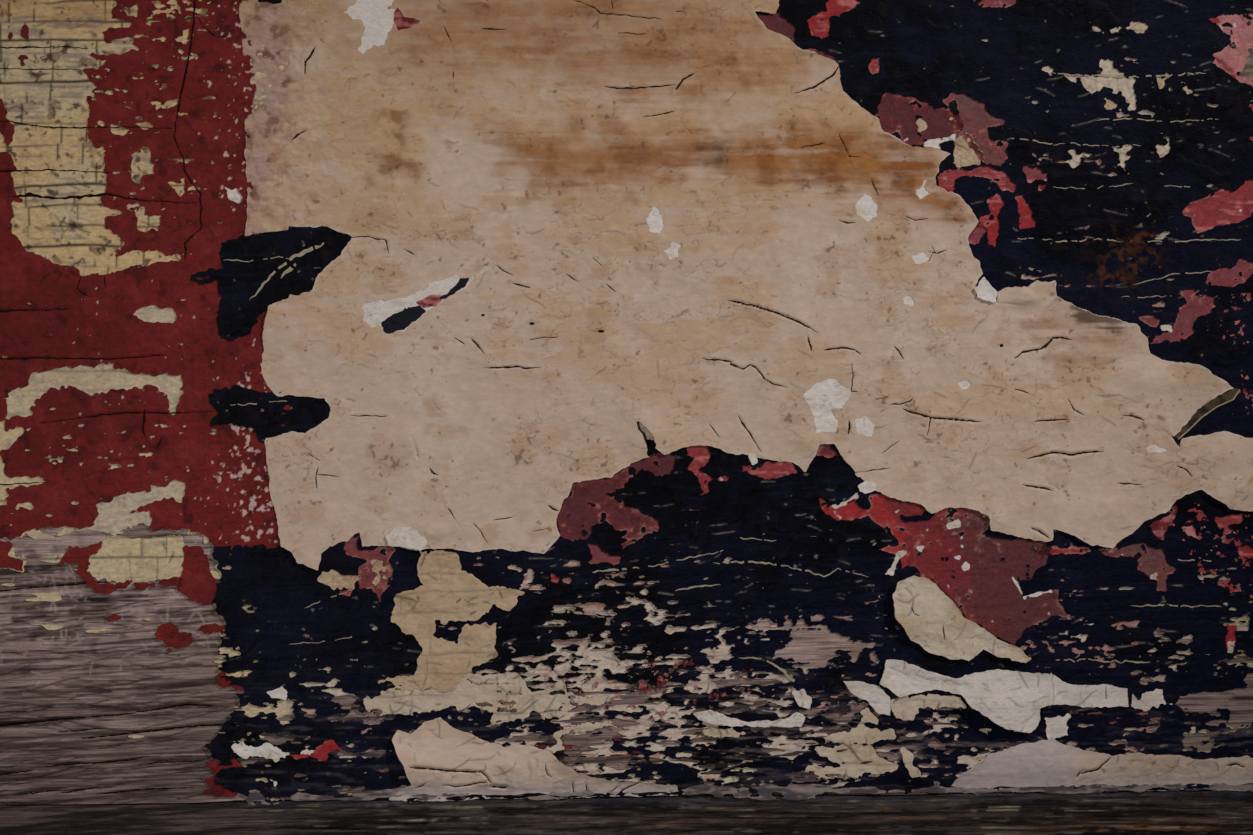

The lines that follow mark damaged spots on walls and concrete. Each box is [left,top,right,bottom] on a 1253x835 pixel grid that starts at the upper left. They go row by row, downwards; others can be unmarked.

peeling [166,3,192,44]
peeling [0,0,185,276]
crack [0,0,225,258]
peeling [133,305,177,323]
peeling [224,187,242,203]
peeling [190,226,351,342]
peeling [646,206,681,259]
peeling [755,0,1253,453]
peeling [0,363,184,510]
peeling [0,541,23,571]
peeling [59,378,1253,803]